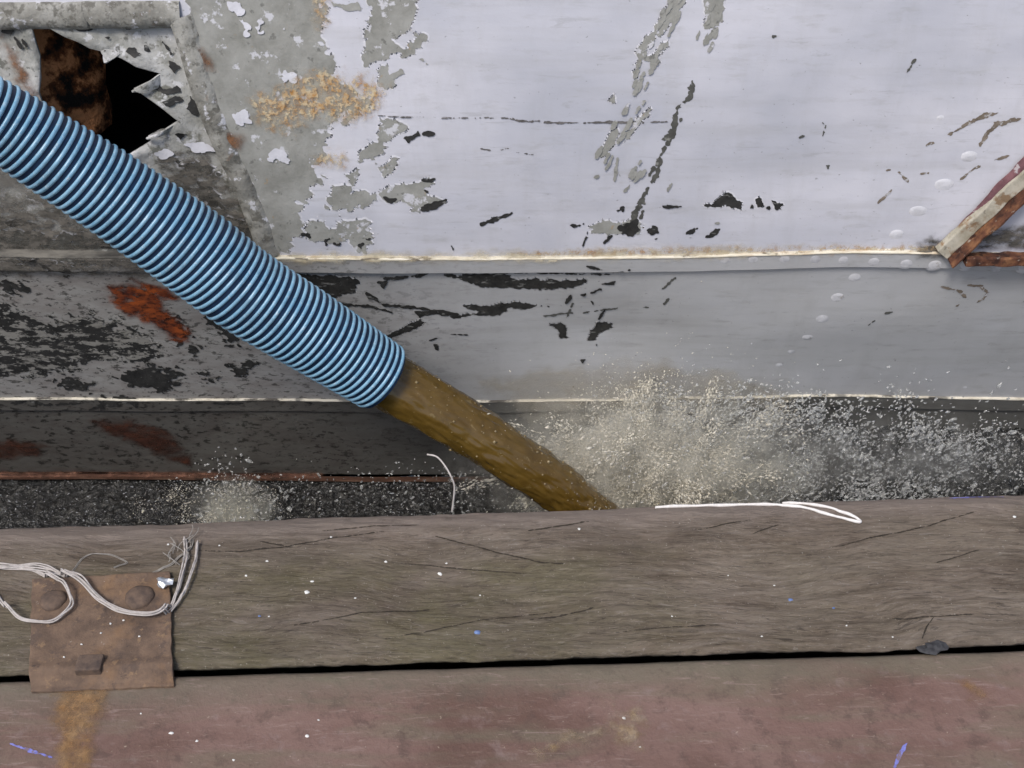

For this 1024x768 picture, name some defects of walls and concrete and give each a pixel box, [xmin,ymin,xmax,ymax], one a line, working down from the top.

peeling [126,45,150,58]
peeling [156,85,199,116]
peeling [184,0,448,255]
corrosion [251,71,384,134]
peeling [594,0,687,193]
peeling [154,133,252,238]
peeling [570,206,659,246]
peeling [686,222,720,238]
peeling [703,191,784,211]
peeling [0,219,259,411]
corrosion [107,281,188,342]
peeling [298,266,631,346]